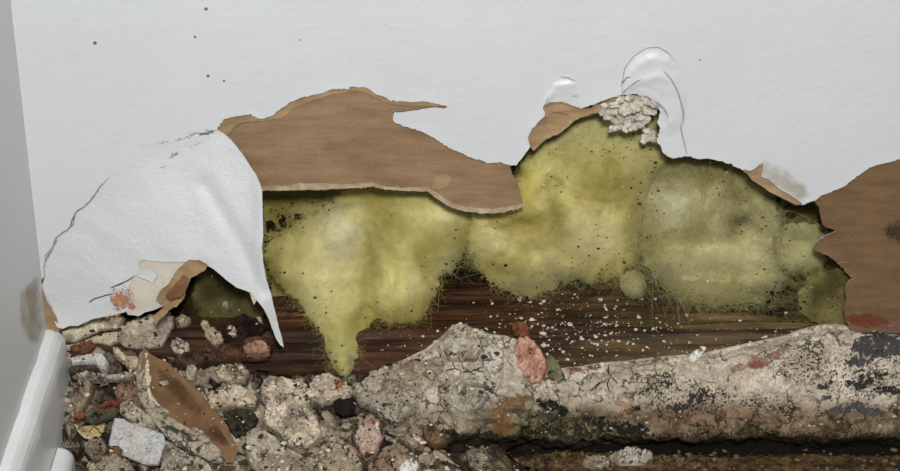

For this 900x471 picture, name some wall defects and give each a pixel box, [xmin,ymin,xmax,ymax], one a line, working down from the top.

spalling [598,94,658,145]
peeling [41,86,524,348]
water stain [263,203,302,292]
peeling [814,159,900,333]
water stain [766,279,807,323]
flaking render [113,347,139,372]
water stain [510,321,566,385]
crack [590,366,618,394]
peeling [688,346,706,363]
water stain [731,313,900,418]
water stain [422,371,900,458]